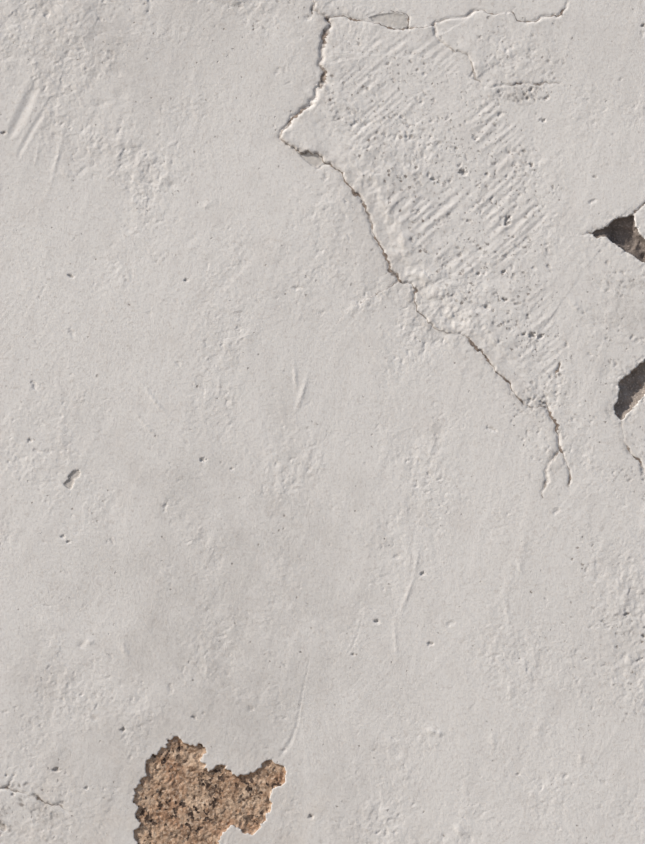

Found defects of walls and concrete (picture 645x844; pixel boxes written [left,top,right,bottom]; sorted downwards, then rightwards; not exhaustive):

crack [288,106,310,126]
crack [319,68,327,88]
crack [311,8,450,44]
crack [478,9,564,22]
crack [321,156,424,317]
flaking render [280,9,570,408]
crack [469,339,571,484]
spalling [133,736,286,844]